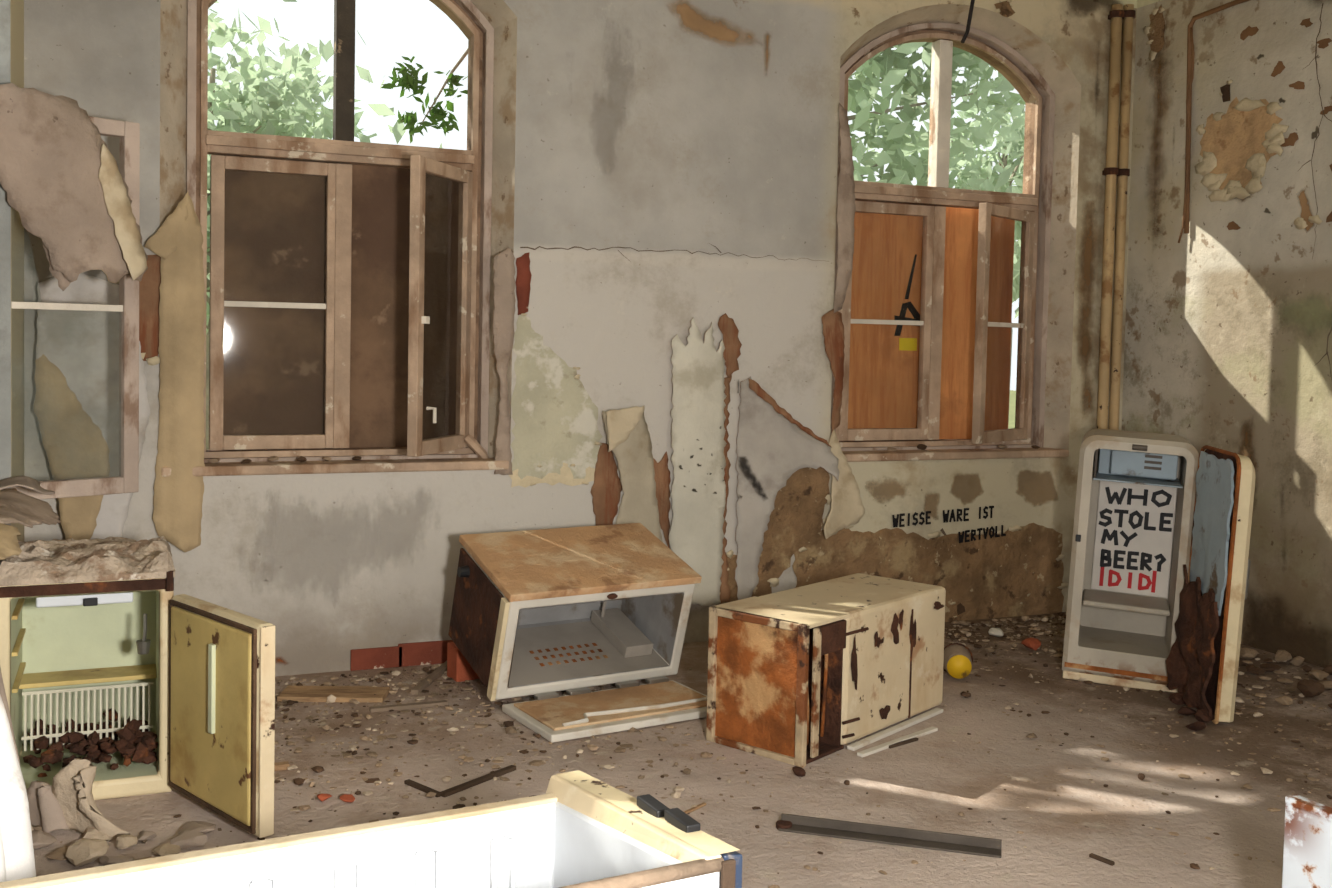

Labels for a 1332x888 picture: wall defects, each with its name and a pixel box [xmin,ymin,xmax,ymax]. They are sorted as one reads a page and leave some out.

spalling [1195,54,1332,202]
crack [1298,3,1331,259]
spalling [493,103,1068,622]